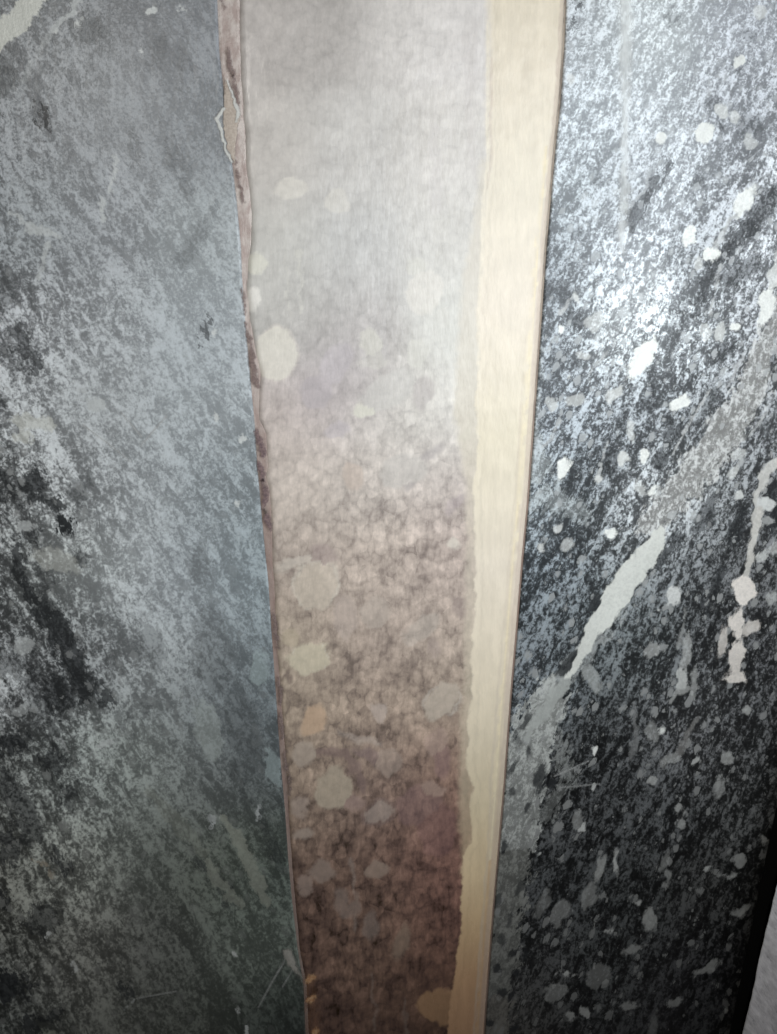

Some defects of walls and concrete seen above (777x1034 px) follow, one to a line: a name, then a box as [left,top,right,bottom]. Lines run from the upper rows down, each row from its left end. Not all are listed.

spalling [215,48,244,201]